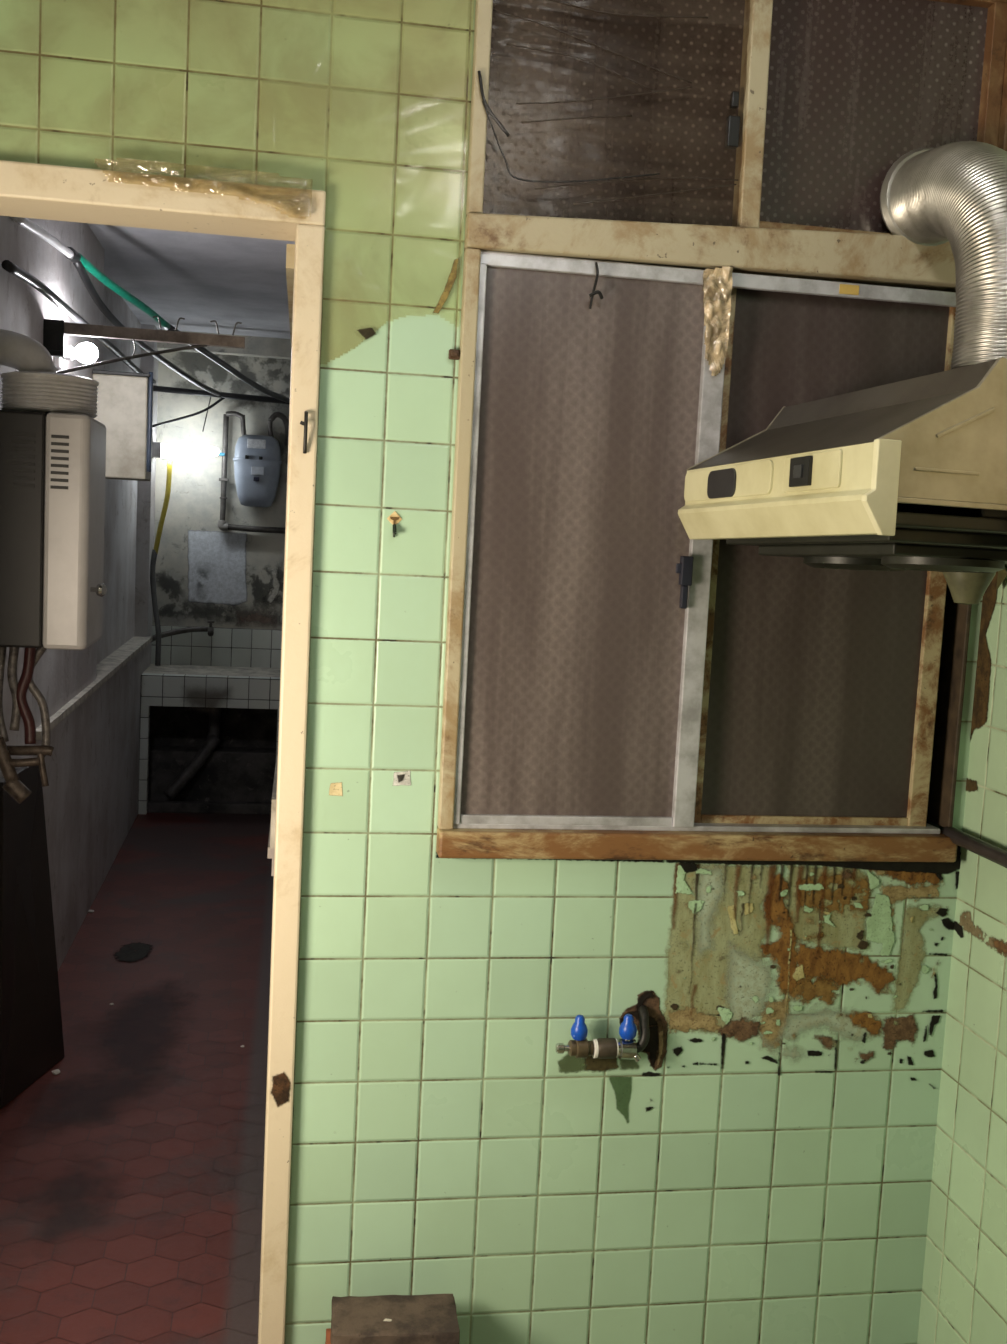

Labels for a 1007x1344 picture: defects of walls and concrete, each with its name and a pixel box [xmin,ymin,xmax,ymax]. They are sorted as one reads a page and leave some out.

damp [181,352,291,464]
damp [157,568,284,622]
peeling [619,864,941,1071]
corrosion [760,870,943,1036]
peeling [959,911,1007,957]